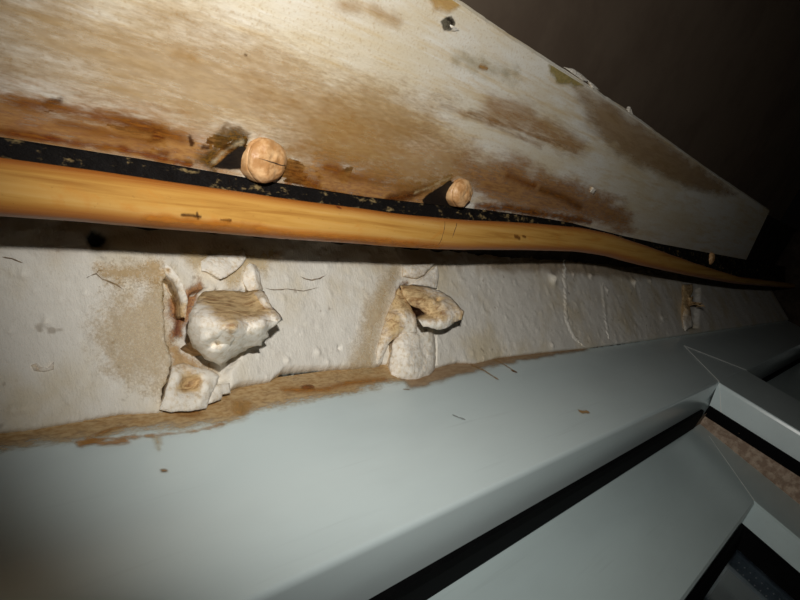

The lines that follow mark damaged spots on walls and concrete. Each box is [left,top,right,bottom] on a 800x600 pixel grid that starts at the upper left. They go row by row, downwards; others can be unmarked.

water stain [0,3,470,188]
water stain [550,65,583,86]
spalling [213,141,246,169]
water stain [488,103,581,151]
water stain [582,96,729,193]
water stain [146,215,241,228]